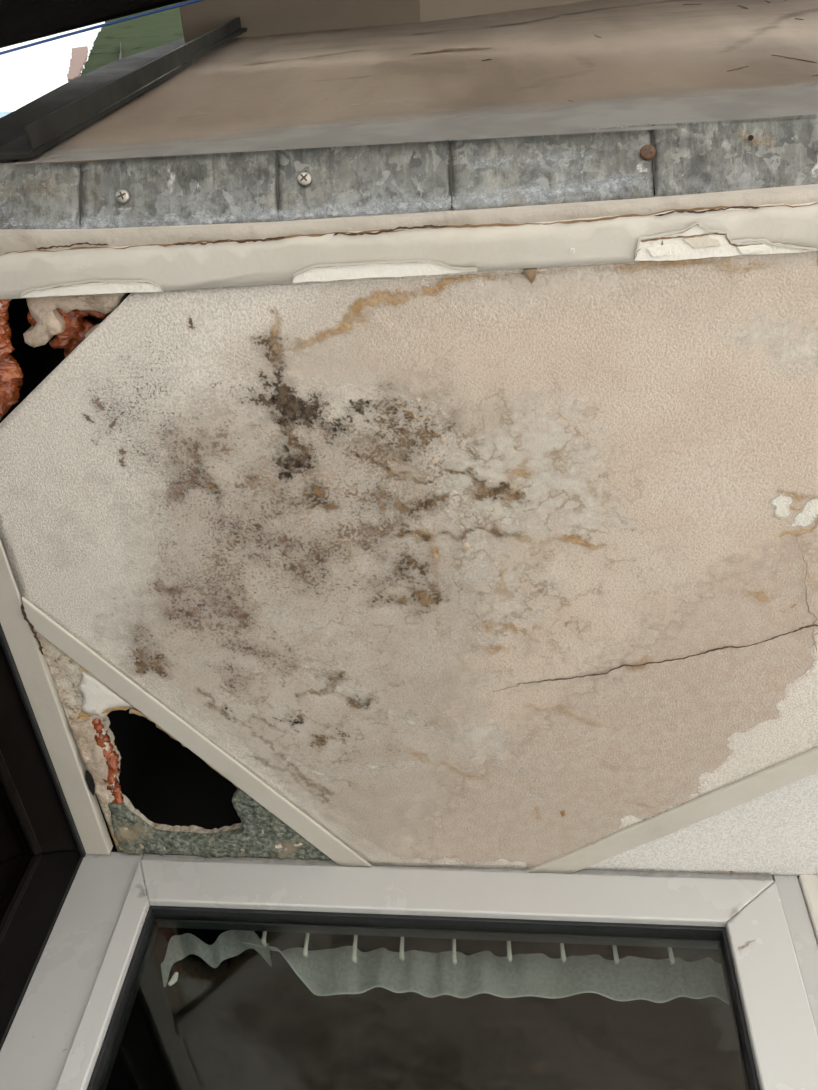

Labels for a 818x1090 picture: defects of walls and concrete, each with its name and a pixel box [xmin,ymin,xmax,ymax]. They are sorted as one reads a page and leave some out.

peeling [634,222,817,261]
peeling [292,260,478,283]
spalling [0,279,162,420]
spalling [770,492,818,537]
damp [122,259,818,866]
crack [493,535,818,692]
flaking render [78,671,130,715]
rust [70,707,186,747]